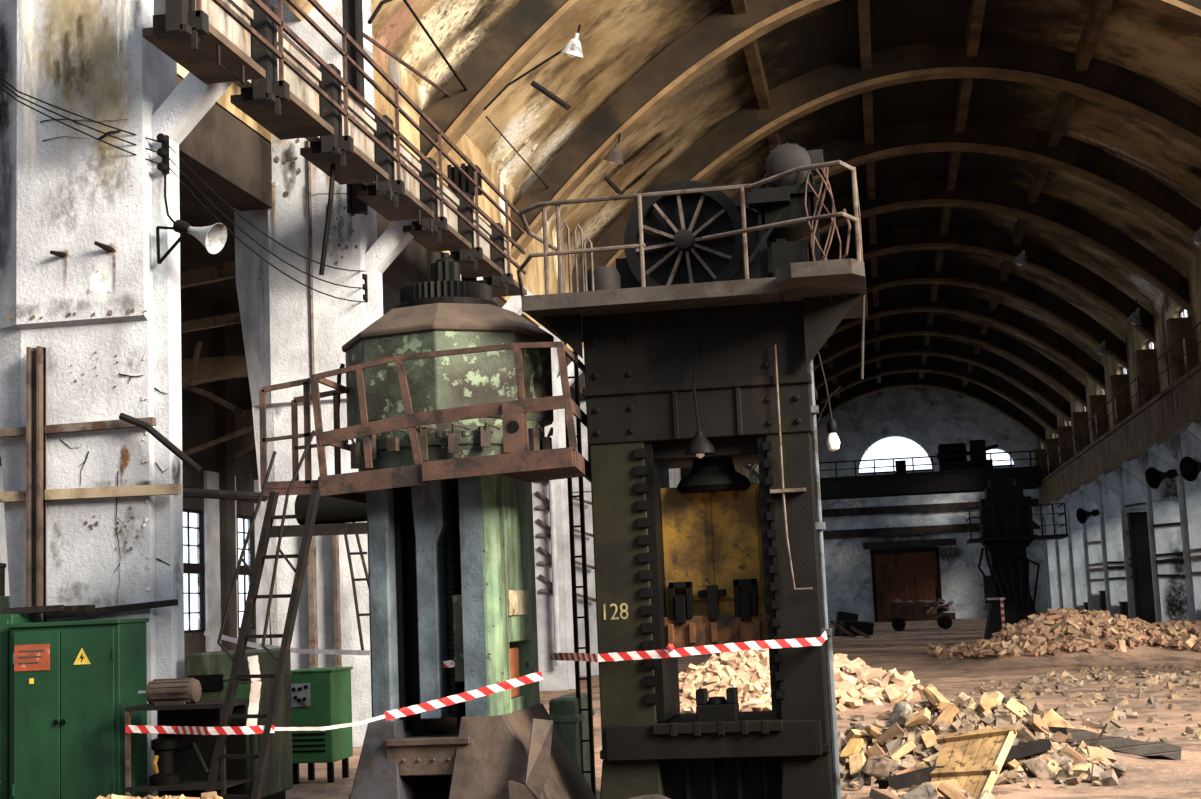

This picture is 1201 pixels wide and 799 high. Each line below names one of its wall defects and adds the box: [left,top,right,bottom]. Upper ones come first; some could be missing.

water stain [439,0,498,55]
water stain [0,0,139,268]
crack [59,439,89,484]
corrosion [120,446,129,481]
crack [113,471,126,603]